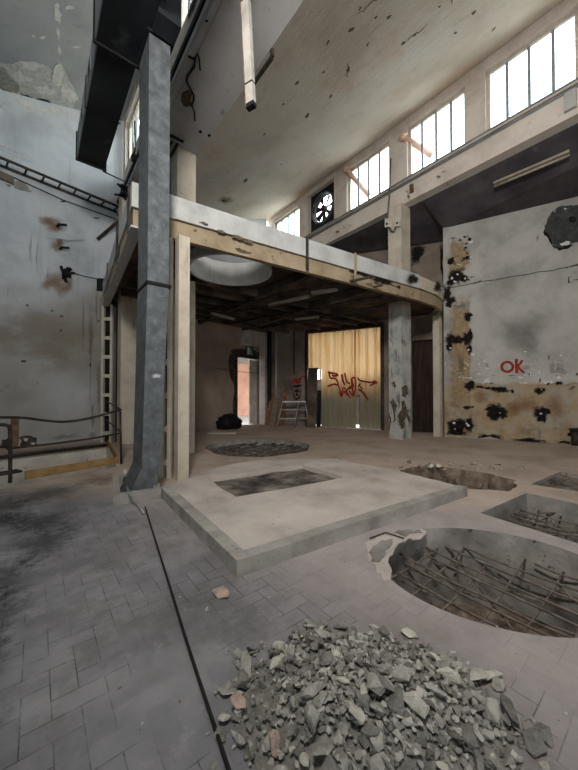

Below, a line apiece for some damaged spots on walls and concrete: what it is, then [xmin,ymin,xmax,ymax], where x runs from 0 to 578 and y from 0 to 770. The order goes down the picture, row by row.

peeling [0,3,79,108]
spalling [543,205,578,251]
flaking render [447,235,474,281]
peeling [388,381,410,431]
spalling [365,465,578,638]